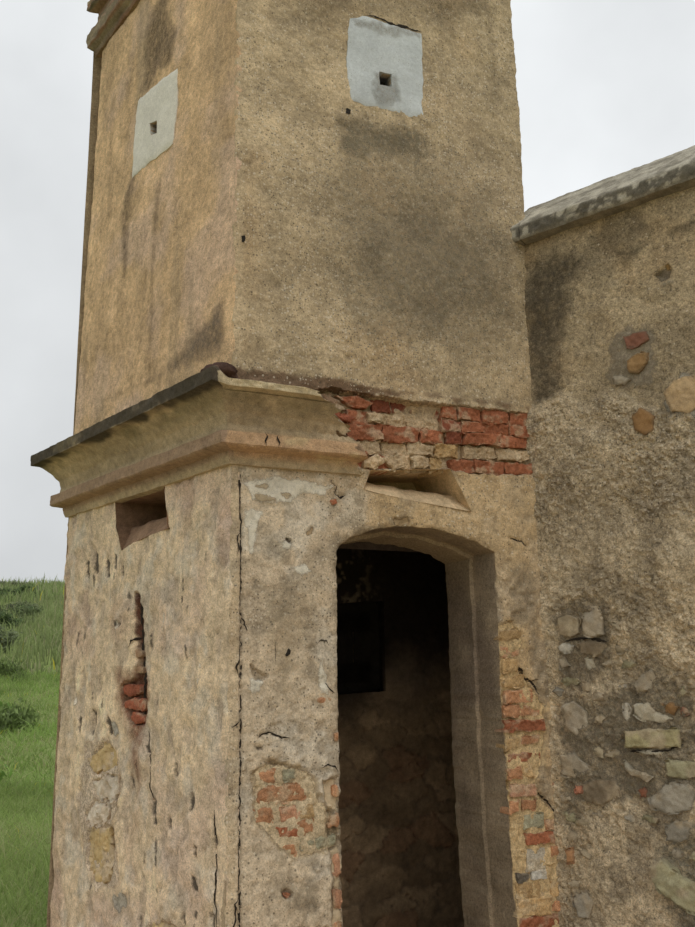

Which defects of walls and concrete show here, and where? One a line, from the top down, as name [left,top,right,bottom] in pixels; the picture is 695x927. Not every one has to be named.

flaking render [87,553,124,584]
crack [214,474,289,927]
flaking render [252,764,343,927]